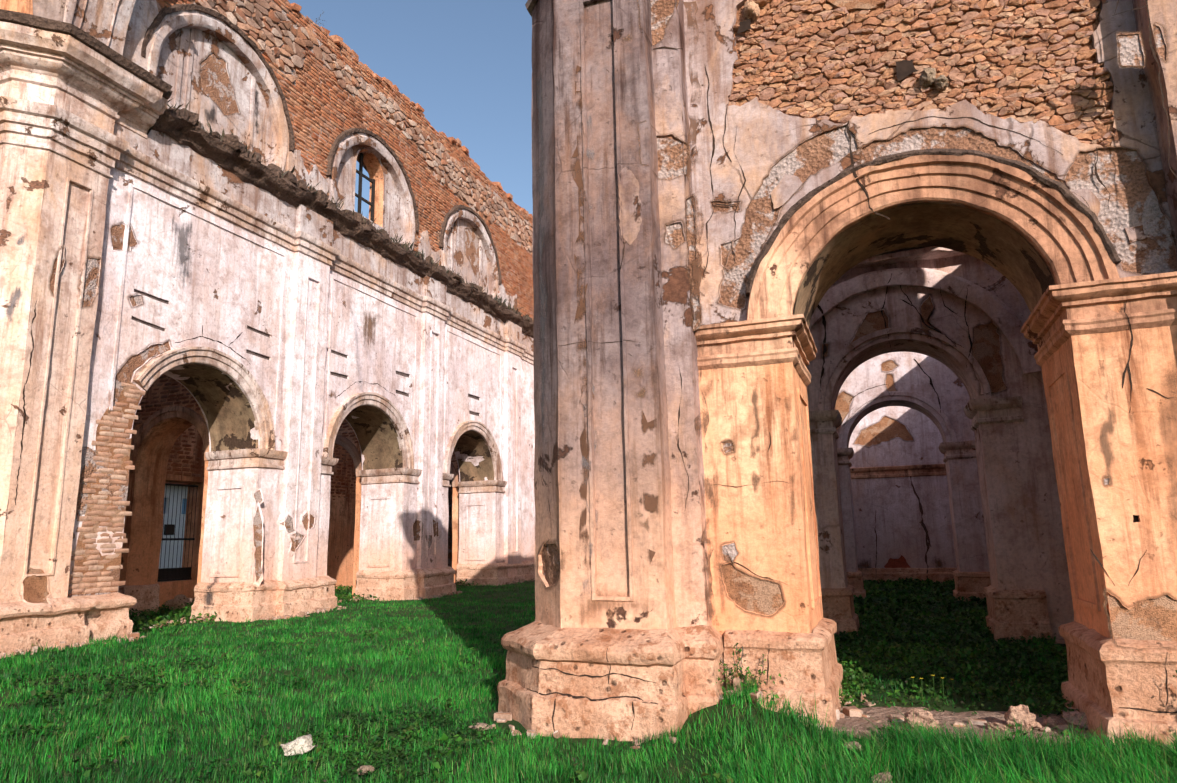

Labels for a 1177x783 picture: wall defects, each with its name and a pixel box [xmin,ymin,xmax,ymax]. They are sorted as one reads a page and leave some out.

spalling [199,51,240,116]
water stain [571,65,595,322]
crack [702,67,746,279]
spalling [711,125,1177,311]
crack [1122,300,1176,413]
flaking render [68,340,177,594]
water stain [578,338,596,565]
spalling [854,416,914,448]
spalling [20,564,52,607]
spalling [537,542,562,588]
spalling [720,542,785,617]
crack [910,476,931,578]